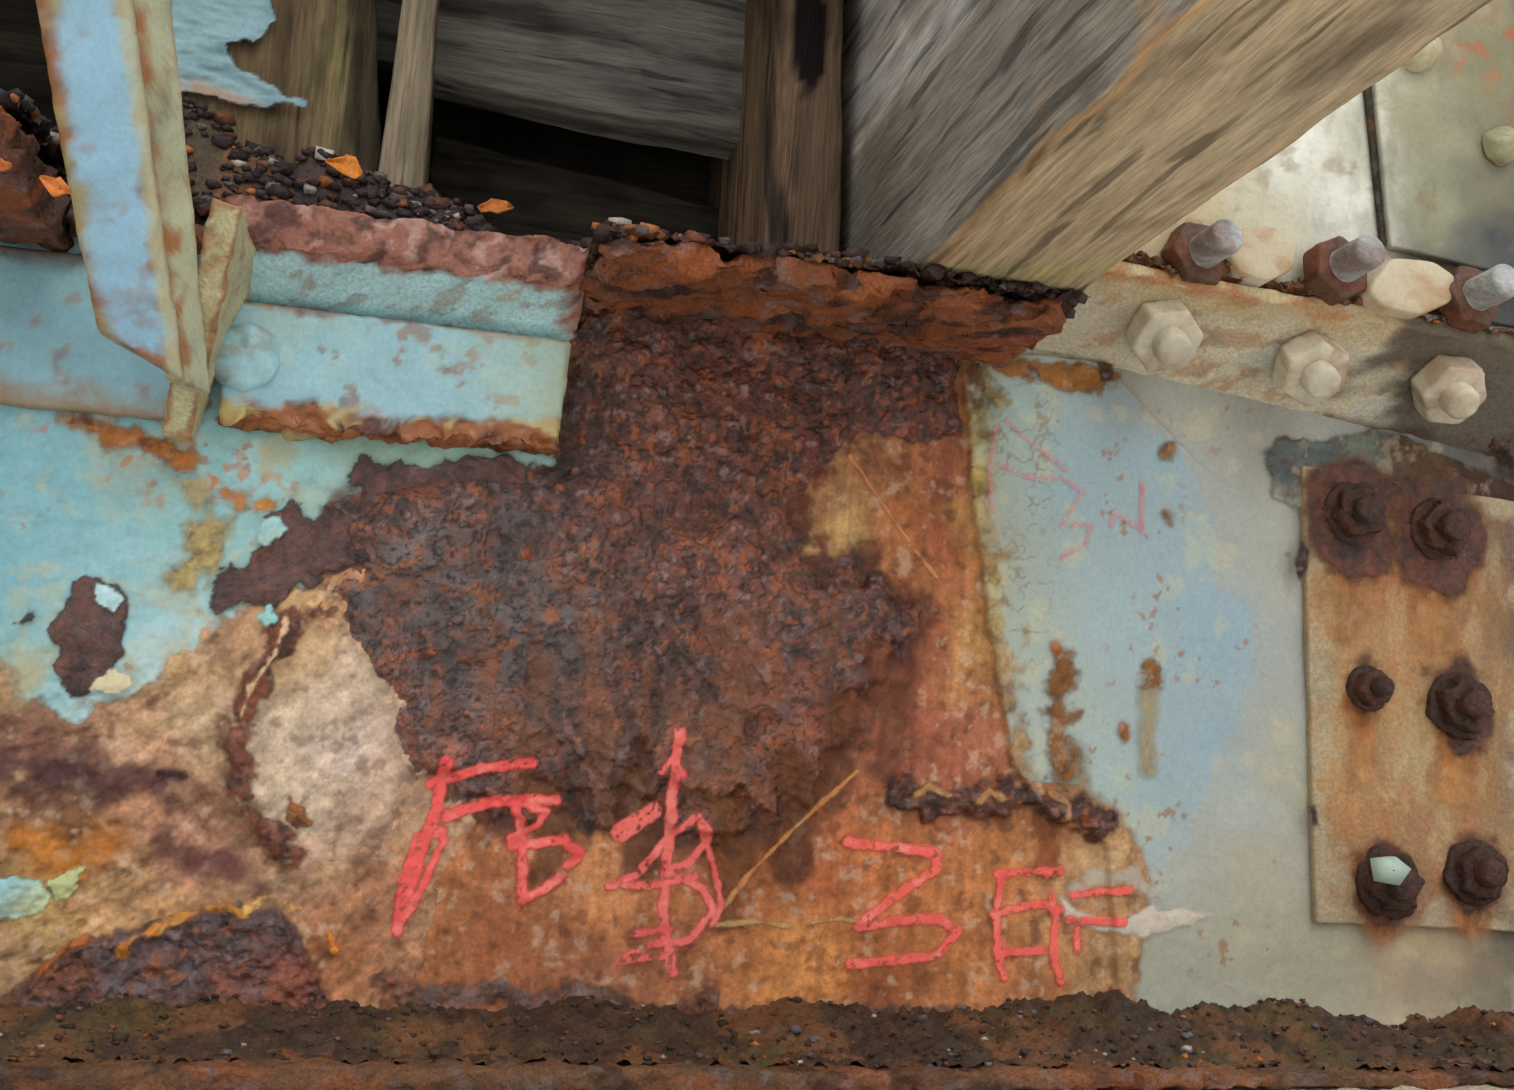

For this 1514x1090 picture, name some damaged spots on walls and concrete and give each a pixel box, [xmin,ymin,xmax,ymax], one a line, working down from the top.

peeling [172,0,307,107]
peeling [347,453,528,499]
peeling [210,499,371,626]
rust [1302,455,1488,681]
peeling [13,575,132,697]
rust [0,307,1152,1016]
rust [1435,717,1494,806]
peeling [47,866,86,901]
rust [1355,895,1404,941]
rust [1445,886,1498,935]